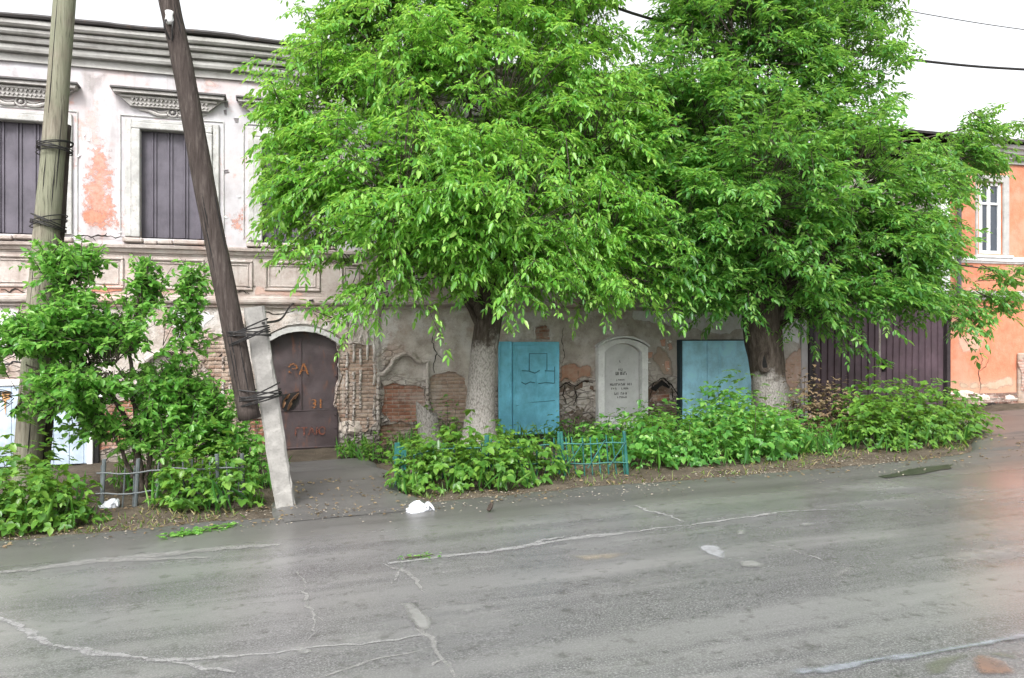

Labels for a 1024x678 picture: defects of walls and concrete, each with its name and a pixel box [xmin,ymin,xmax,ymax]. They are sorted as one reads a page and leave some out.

peeling [75,134,125,237]
flaking render [534,323,552,341]
flaking render [648,339,677,426]
flaking render [333,342,468,445]
flaking render [559,380,595,432]
crack [687,509,826,526]
crack [517,537,563,548]
crack [100,555,208,563]
crack [305,635,421,648]
crack [160,656,236,673]